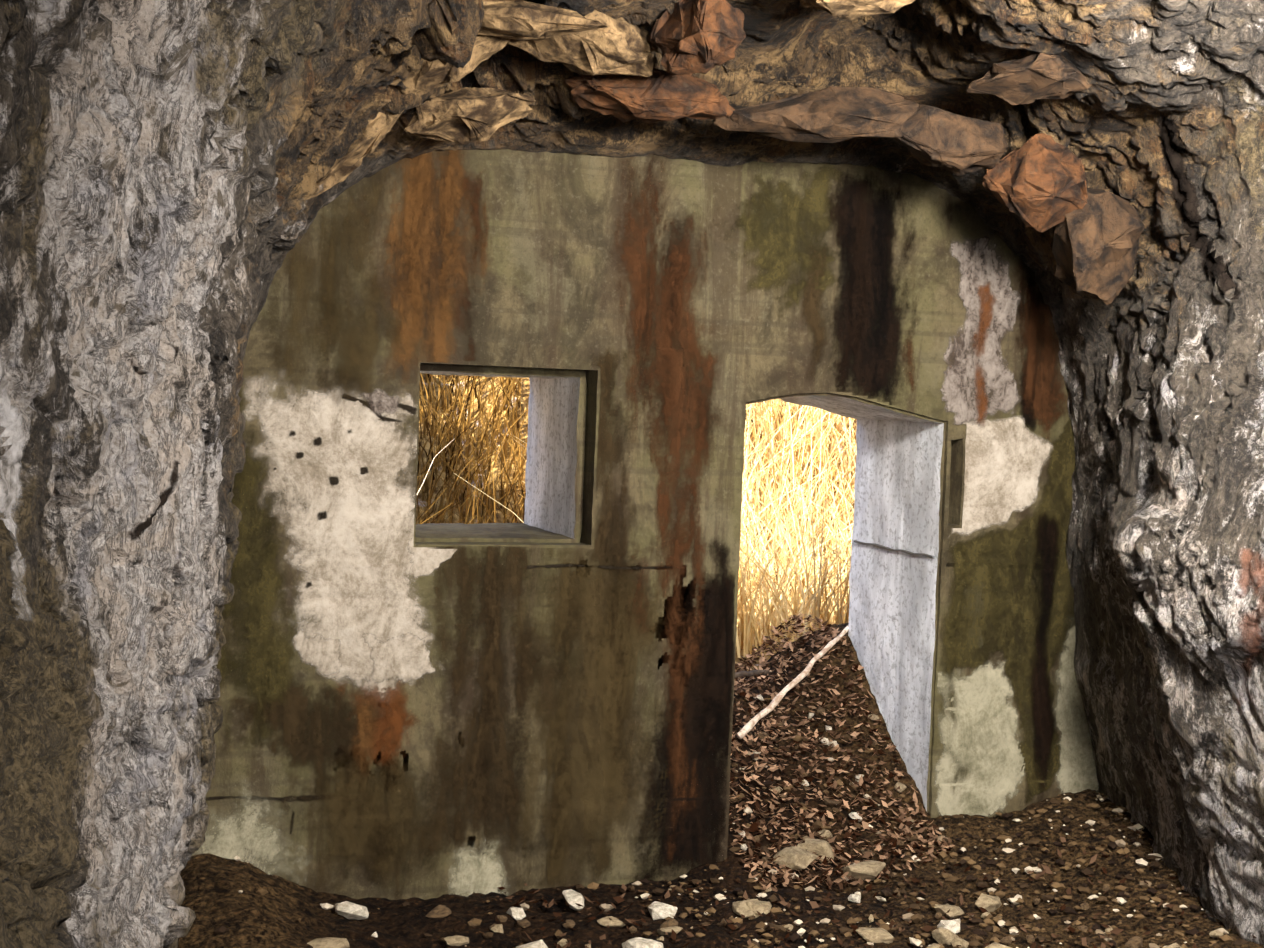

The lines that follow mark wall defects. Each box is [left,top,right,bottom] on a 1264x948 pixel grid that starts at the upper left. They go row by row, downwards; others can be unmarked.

flaking render [244,378,457,699]
corrosion [617,173,735,881]
leakage [737,165,914,405]
flaking render [941,232,1053,534]
corrosion [356,683,413,778]
peeling [935,662,1026,817]